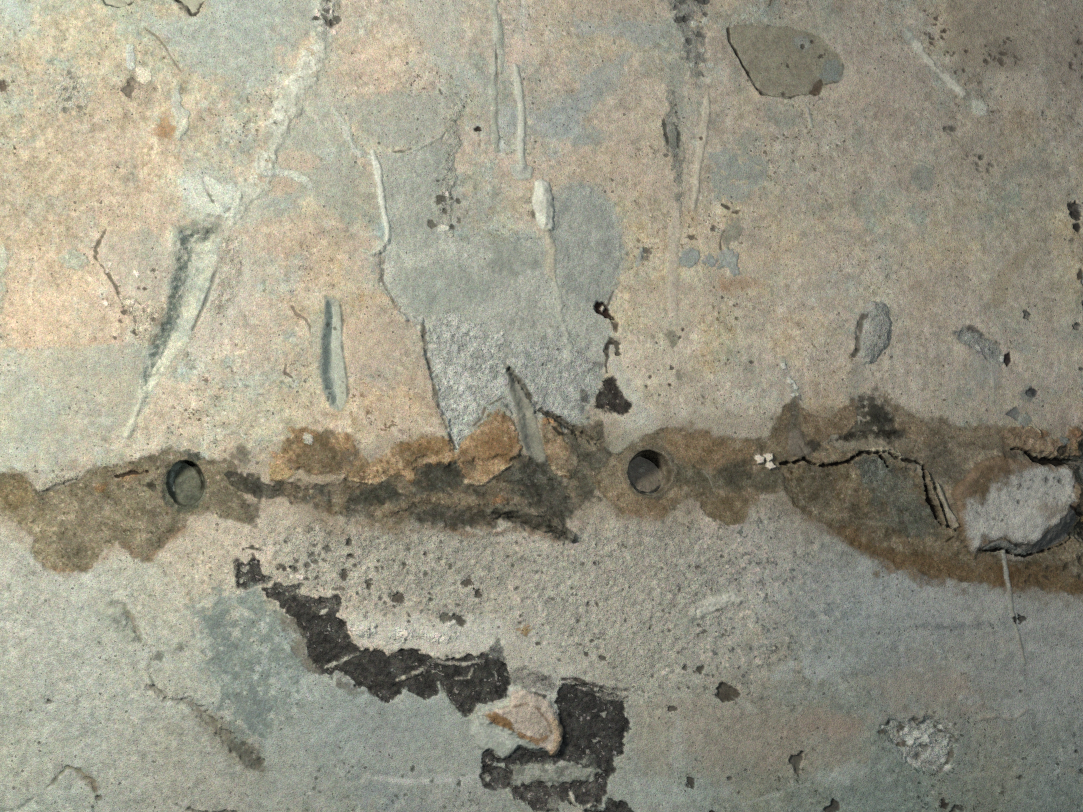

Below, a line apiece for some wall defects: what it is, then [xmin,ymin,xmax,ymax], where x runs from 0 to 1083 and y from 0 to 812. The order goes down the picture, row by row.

spalling [362,131,652,452]
spalling [665,328,684,348]
water stain [0,358,1083,595]
crack [779,445,1083,558]
flaking render [952,387,1083,555]
water stain [234,545,633,812]
spalling [268,524,758,714]
flaking render [484,690,563,756]
spalling [824,799,839,812]